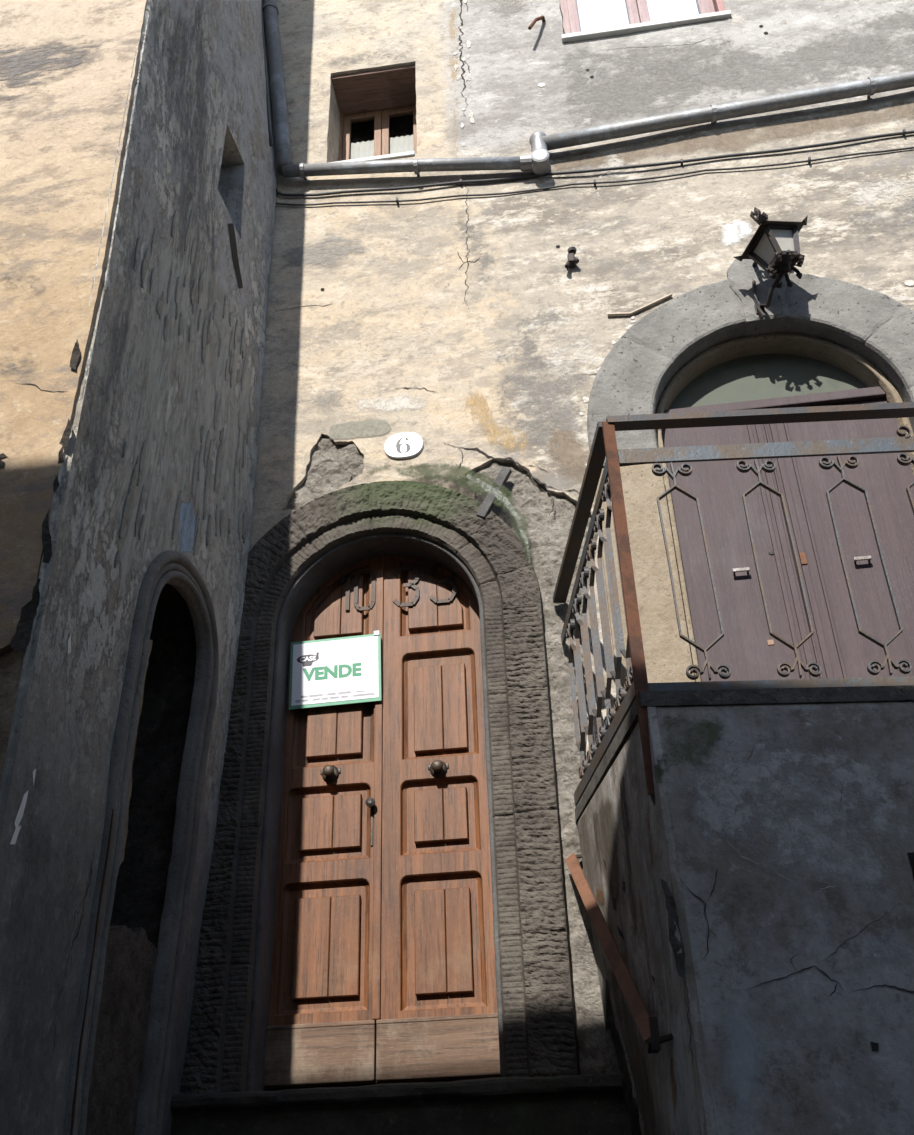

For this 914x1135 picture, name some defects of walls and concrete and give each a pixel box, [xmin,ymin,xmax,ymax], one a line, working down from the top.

damp [0,37,99,100]
crack [453,0,474,146]
crack [457,173,479,312]
spalling [70,340,80,369]
spalling [42,508,52,564]
spalling [53,418,72,493]
spalling [284,438,364,511]
damp [467,475,528,544]
spalling [0,579,50,783]
spalling [471,461,644,1135]
crack [680,869,718,1065]
crack [747,907,914,997]